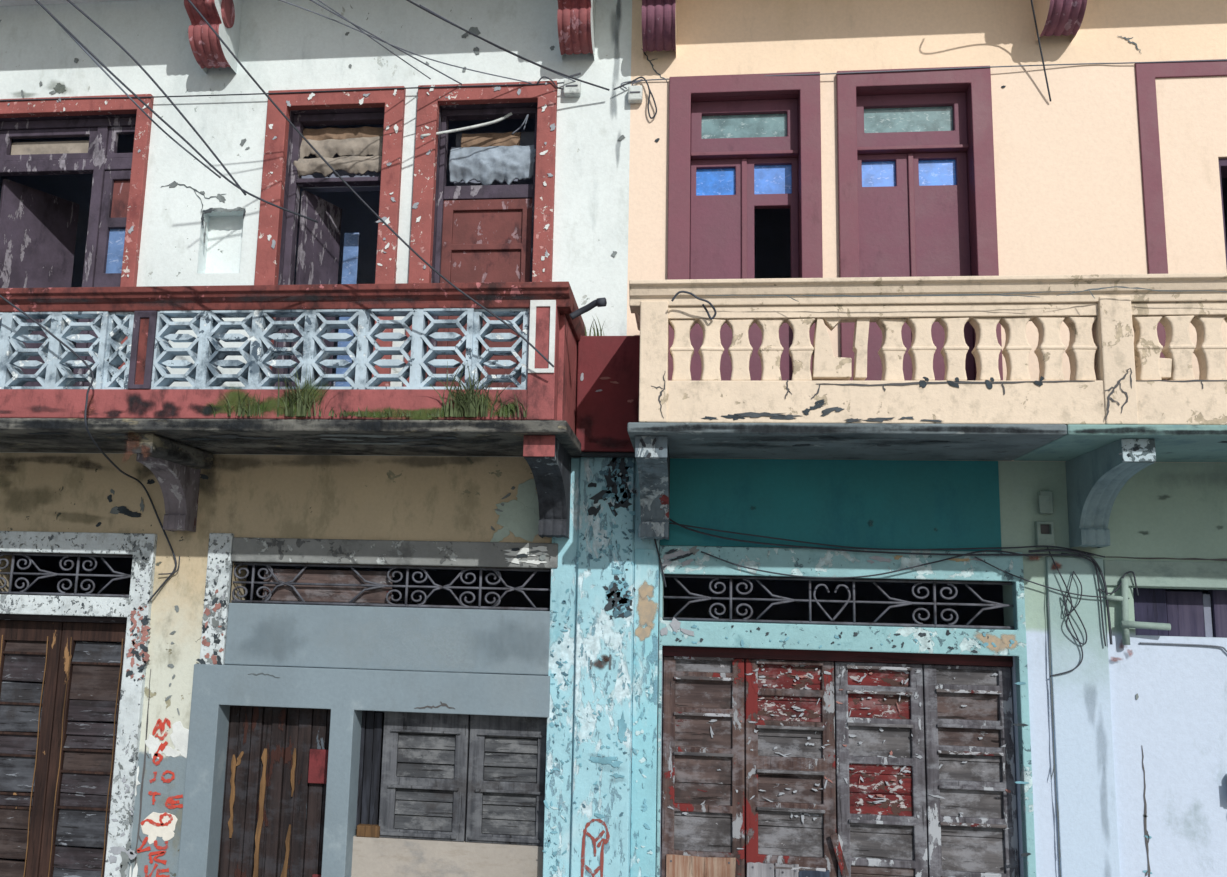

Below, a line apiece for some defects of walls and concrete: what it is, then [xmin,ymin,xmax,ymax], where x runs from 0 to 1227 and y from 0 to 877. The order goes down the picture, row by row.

crack [161,181,224,212]
damp [15,394,280,468]
damp [341,420,523,454]
crack [785,368,1227,420]
peeling [490,479,548,565]
peeling [197,537,230,665]
peeling [548,438,663,797]
peeling [660,617,704,644]
peeling [870,630,954,649]
peeling [108,664,189,877]
peeling [543,797,623,877]
crack [1142,748,1151,877]